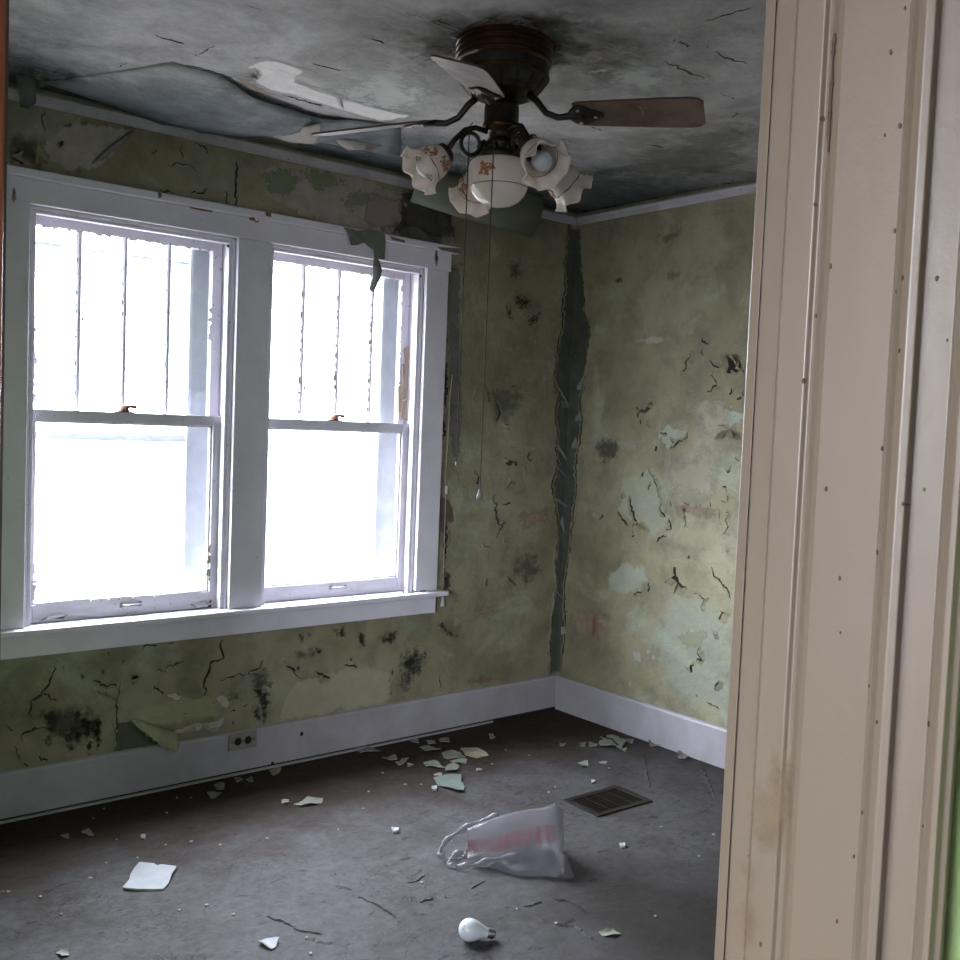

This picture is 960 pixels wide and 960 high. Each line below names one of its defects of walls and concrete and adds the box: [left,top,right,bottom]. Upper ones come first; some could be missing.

damp [430,15,585,66]
spalling [33,115,134,176]
crack [150,143,238,206]
damp [394,191,455,240]
crack [680,335,745,400]
peeling [543,223,594,676]
peeling [614,462,680,544]
crack [598,406,740,710]
mould [252,669,270,724]
crack [203,638,358,696]
peeling [600,554,734,728]
mould [44,709,101,750]